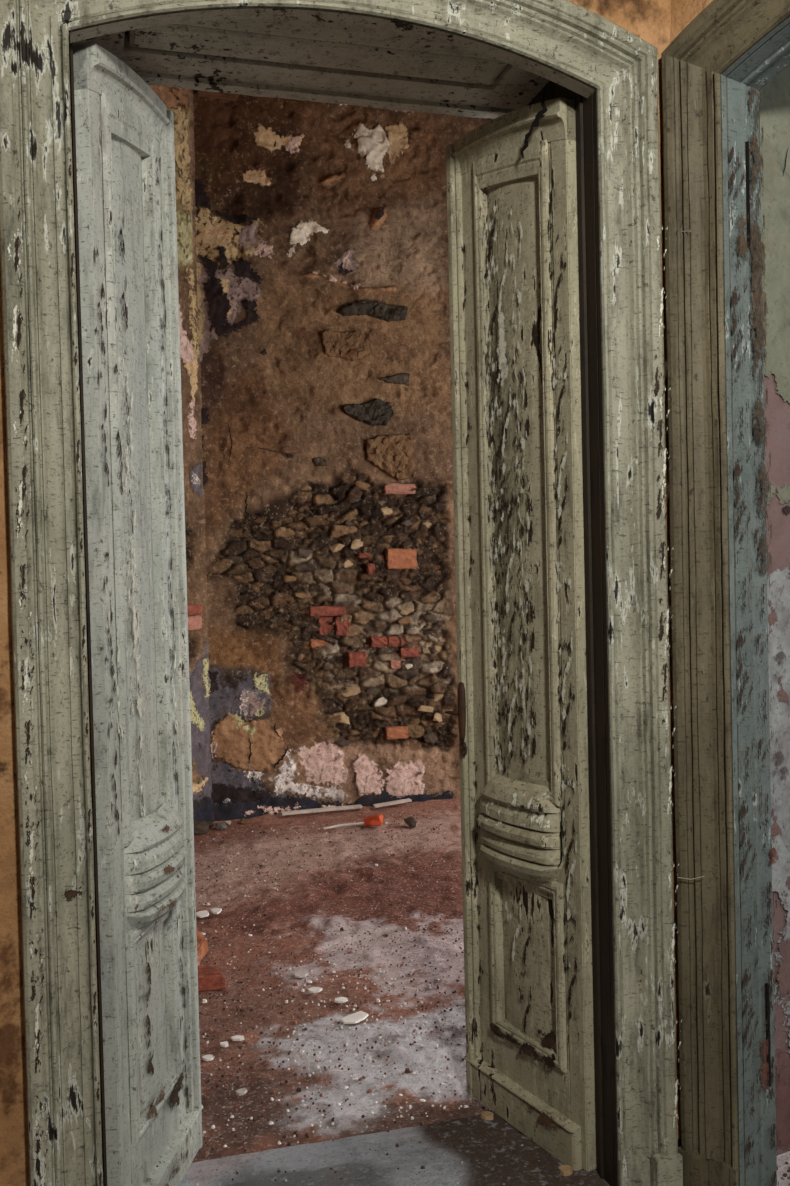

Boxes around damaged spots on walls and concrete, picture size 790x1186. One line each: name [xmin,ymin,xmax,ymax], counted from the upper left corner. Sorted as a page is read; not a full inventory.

peeling [344,109,415,181]
peeling [149,85,330,468]
flaking render [336,300,408,322]
flaking render [283,575,350,648]
flaking render [326,712,351,747]
flaking render [330,520,417,574]
flaking render [341,398,432,528]
flaking render [341,607,444,744]
peeling [481,188,537,773]
peeling [538,200,572,591]
flaking render [730,65,790,1165]
peeling [473,632,580,1073]